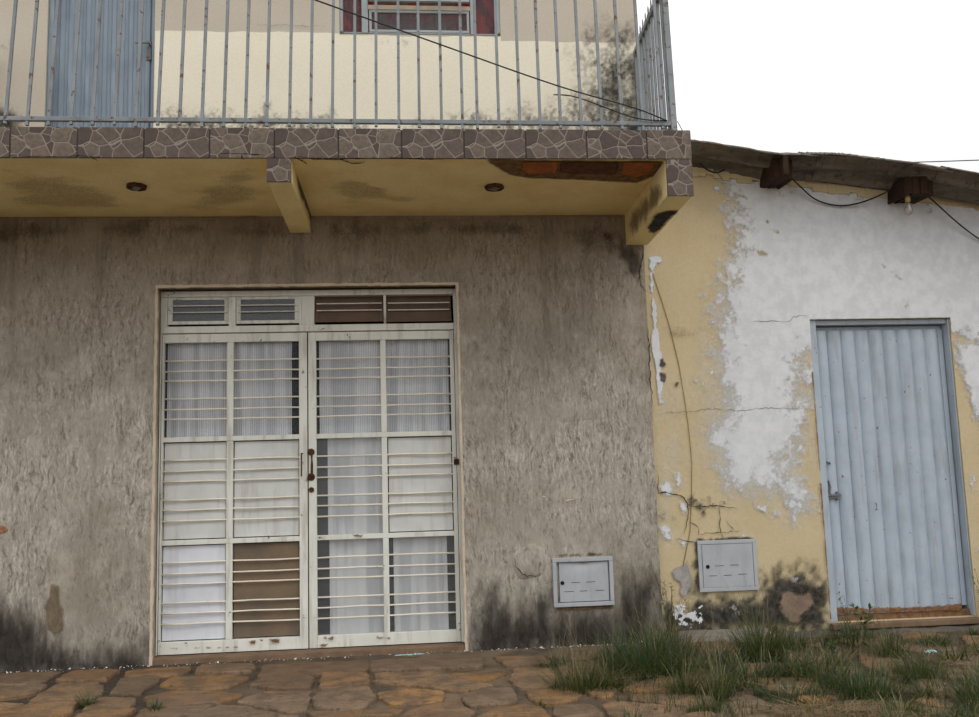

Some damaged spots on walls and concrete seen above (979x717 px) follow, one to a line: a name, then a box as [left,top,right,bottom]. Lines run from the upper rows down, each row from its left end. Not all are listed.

damp [526,31,636,130]
peeling [649,256,666,404]
peeling [695,178,979,523]
peeling [658,472,682,496]
peeling [658,502,687,548]
damp [0,585,140,673]
damp [473,537,828,651]
flaking render [665,563,703,628]